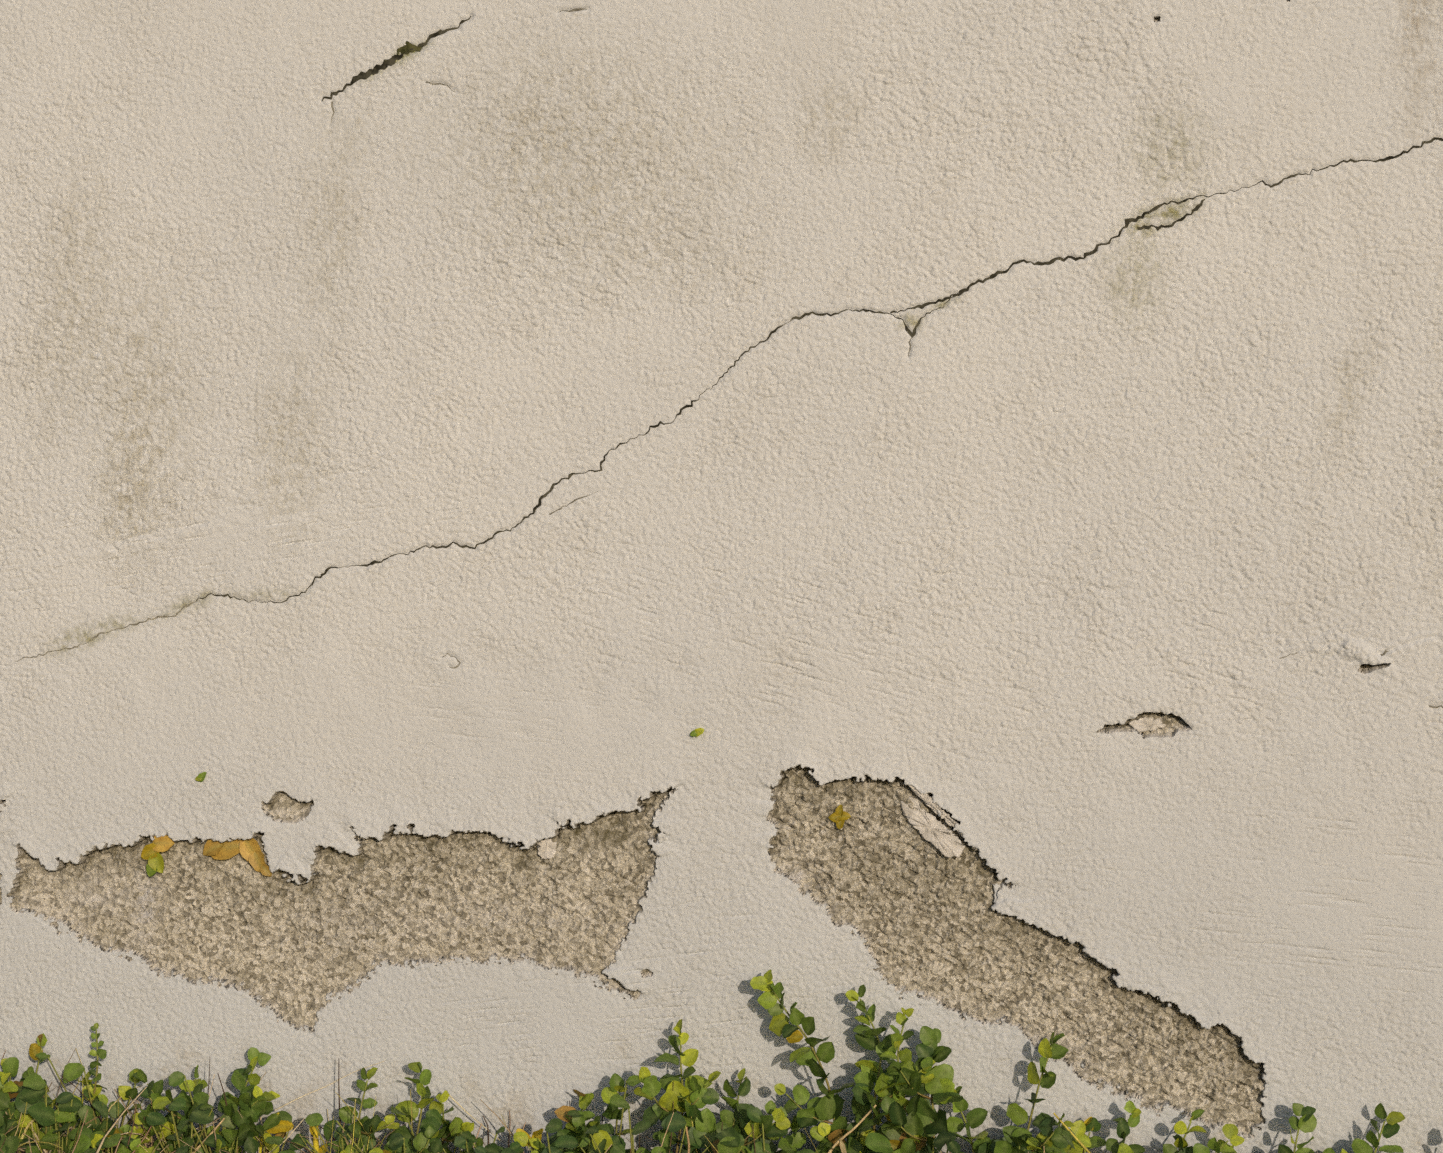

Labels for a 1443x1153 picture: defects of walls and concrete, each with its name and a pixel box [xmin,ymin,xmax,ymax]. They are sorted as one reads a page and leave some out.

crack [322,16,471,125]
crack [18,137,1443,661]
spalling [1096,712,1192,739]
spalling [0,787,677,1033]
spalling [766,765,1267,1140]